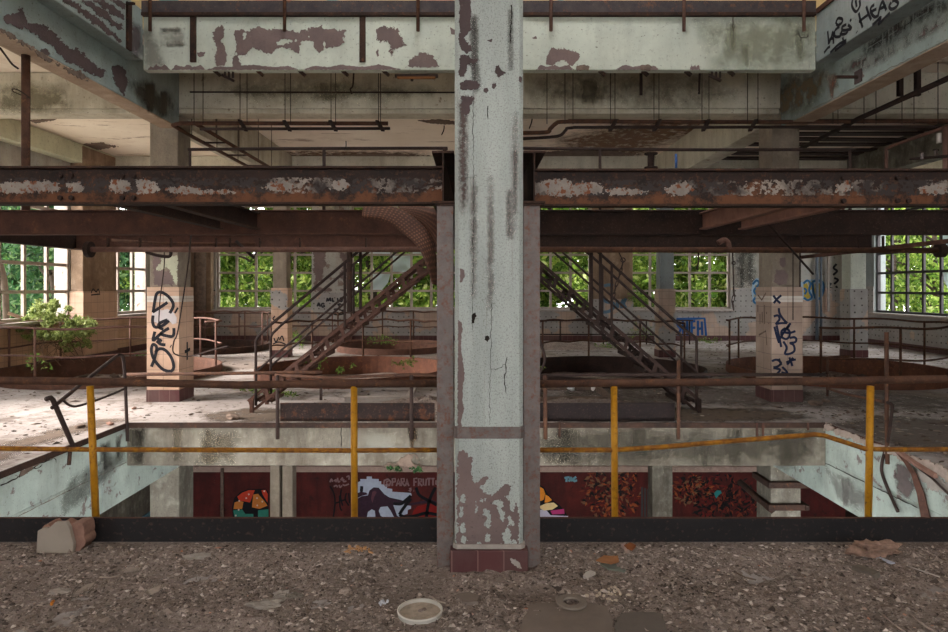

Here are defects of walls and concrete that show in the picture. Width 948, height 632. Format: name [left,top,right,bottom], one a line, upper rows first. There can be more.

peeling [0,0,128,96]
damp [133,83,173,116]
peeling [148,25,440,70]
peeling [418,0,506,208]
peeling [536,47,589,71]
peeling [455,450,520,544]